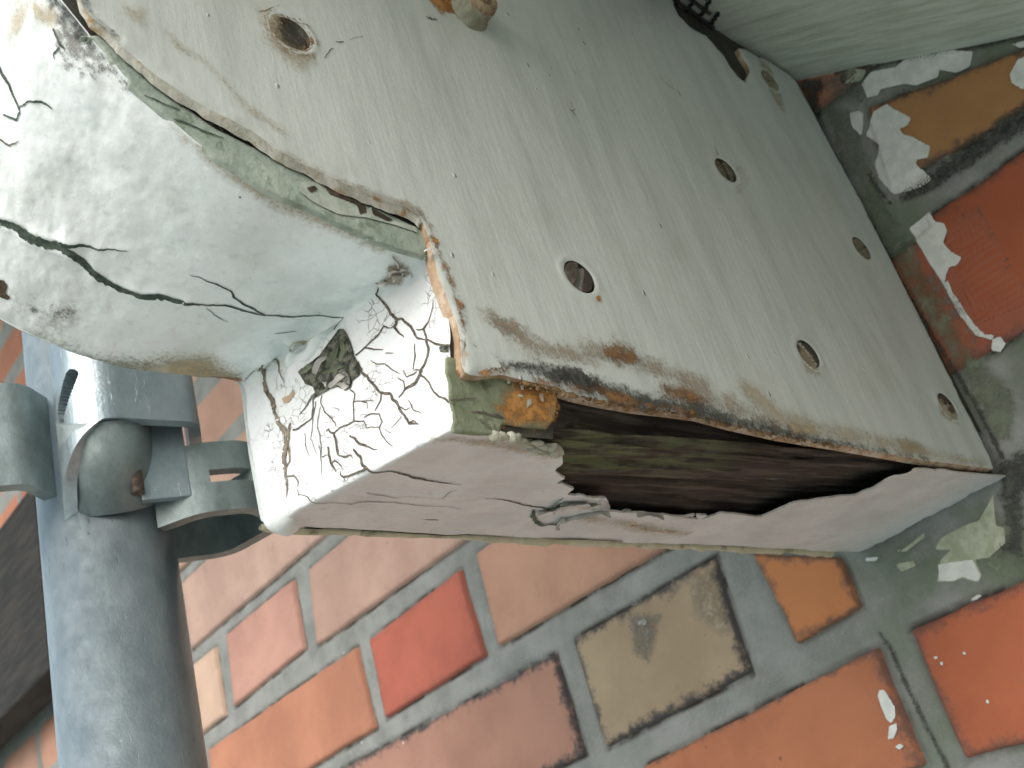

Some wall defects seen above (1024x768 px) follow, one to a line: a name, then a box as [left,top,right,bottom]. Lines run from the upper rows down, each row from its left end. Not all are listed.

crack [0,68,52,146]
peeling [838,50,973,194]
peeling [1010,41,1024,89]
peeling [299,182,417,232]
crack [0,220,343,334]
peeling [910,212,1005,352]
peeling [298,329,360,398]
crack [243,283,504,509]
corrosion [478,314,842,448]
peeling [488,430,564,459]
peeling [530,499,664,531]
peeling [936,496,1005,582]